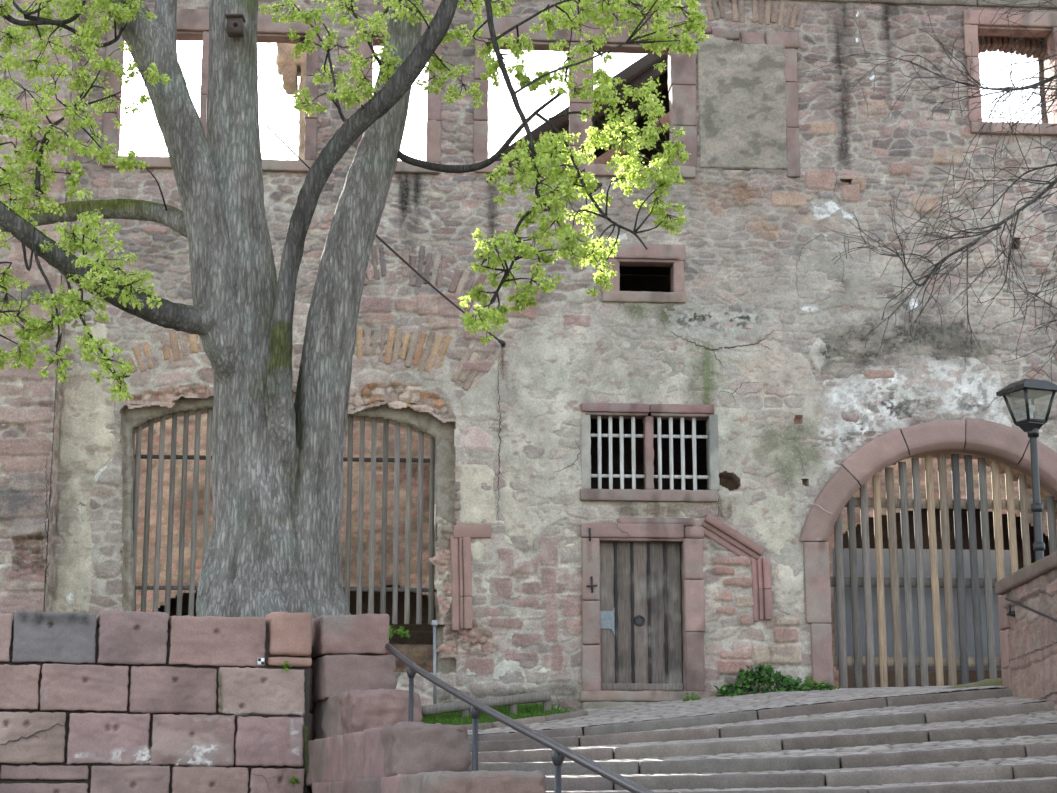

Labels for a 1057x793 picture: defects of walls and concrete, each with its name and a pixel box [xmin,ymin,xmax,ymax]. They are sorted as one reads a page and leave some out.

leakage [836,6,859,157]
peeling [0,282,211,613]
peeling [347,236,999,659]
crack [673,329,775,366]